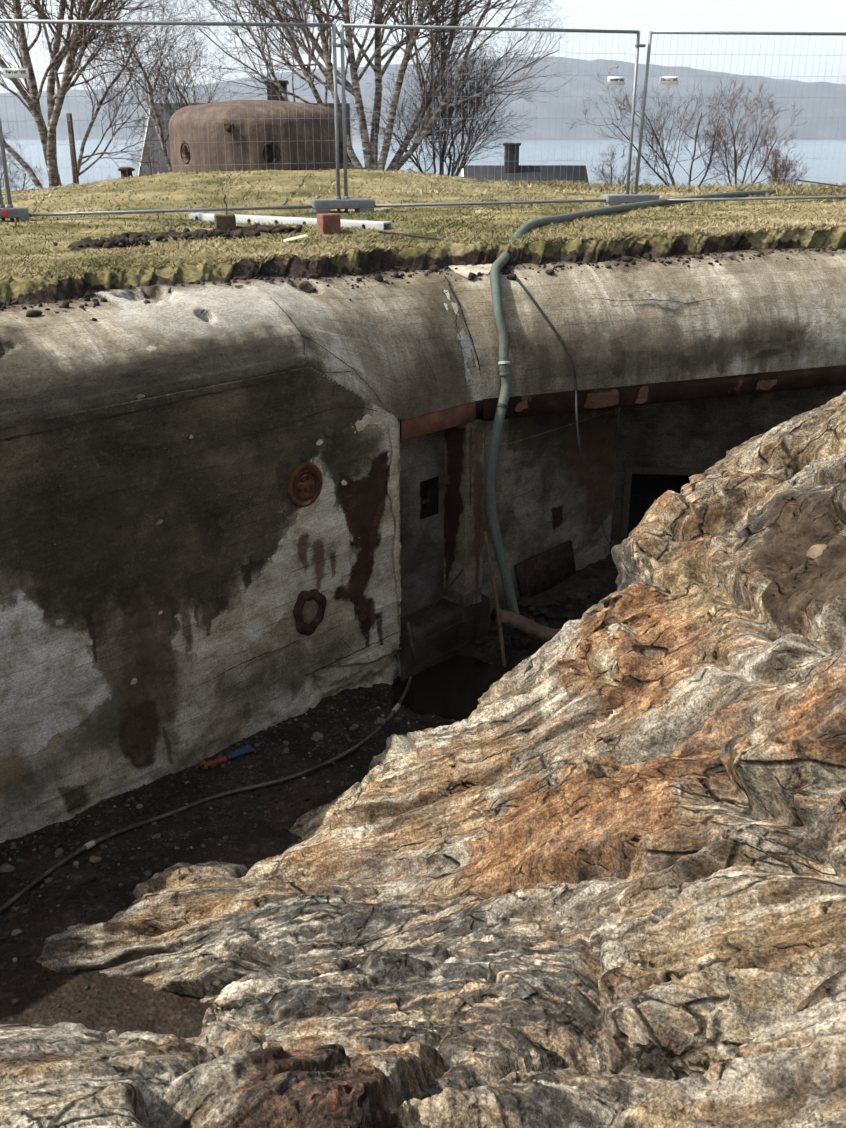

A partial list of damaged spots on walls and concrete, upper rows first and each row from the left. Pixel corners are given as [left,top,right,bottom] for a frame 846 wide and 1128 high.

damp [0,324,381,769]
rust [298,451,390,647]